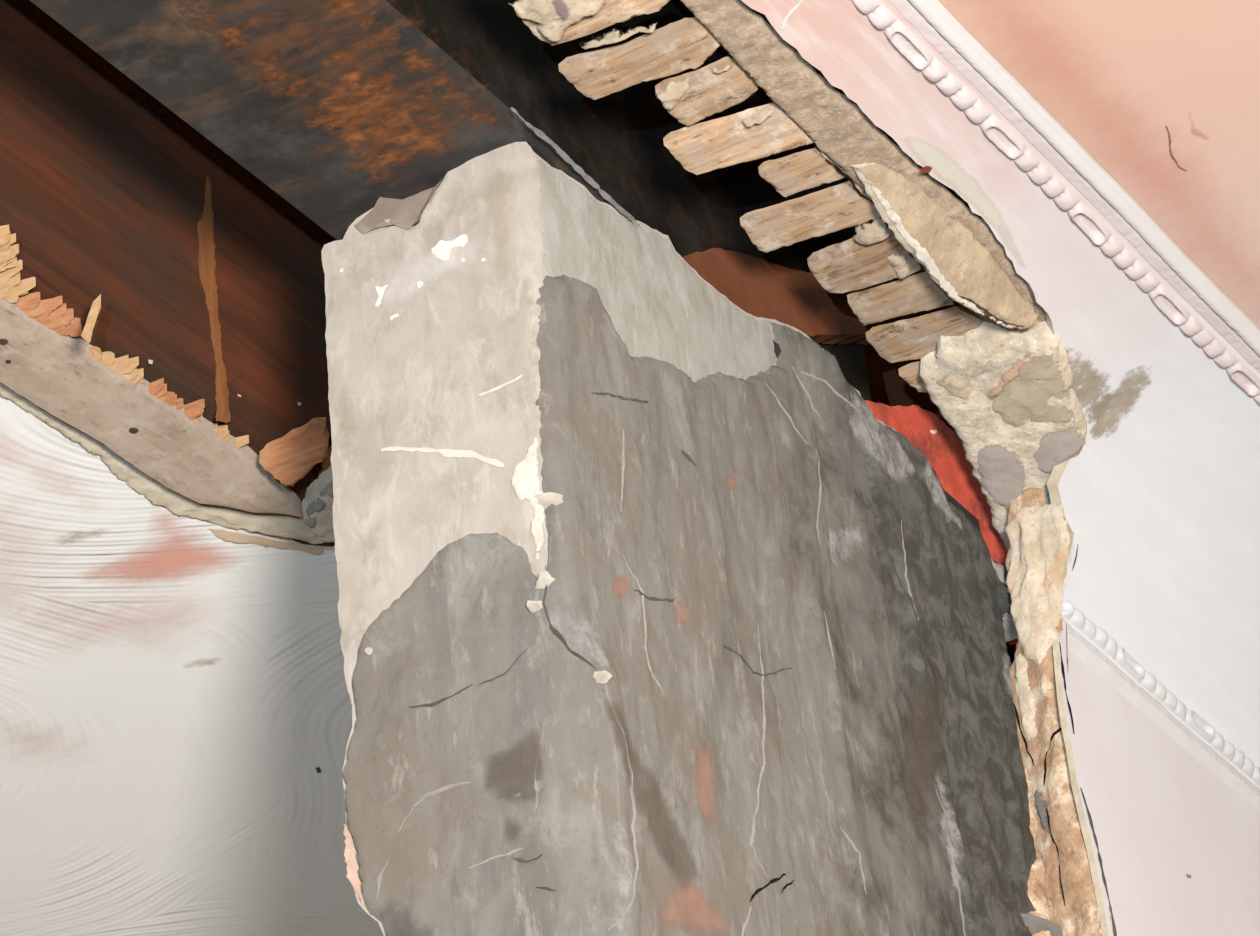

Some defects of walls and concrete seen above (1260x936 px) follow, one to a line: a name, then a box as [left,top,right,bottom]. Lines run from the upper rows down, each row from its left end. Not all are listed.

corrosion [310,52,454,169]
flaking render [525,286,541,409]
flaking render [0,382,335,555]
flaking render [511,437,563,613]
flaking render [680,0,1114,936]
crack [409,568,597,708]
spalling [593,670,612,685]
crack [1013,626,1075,905]